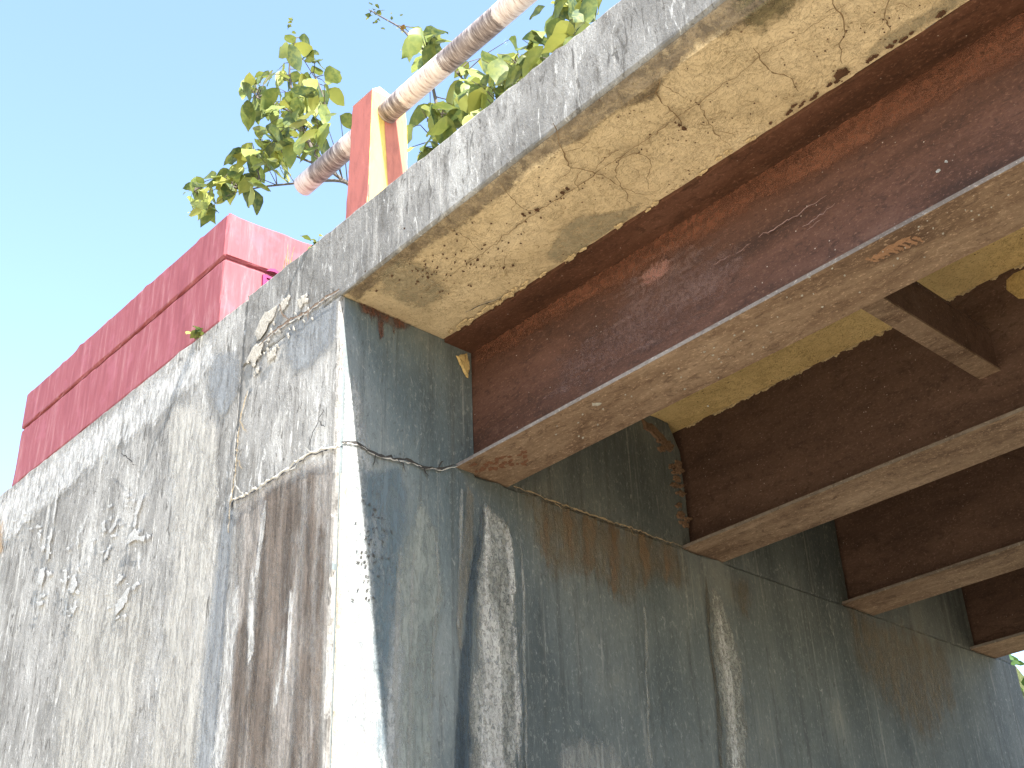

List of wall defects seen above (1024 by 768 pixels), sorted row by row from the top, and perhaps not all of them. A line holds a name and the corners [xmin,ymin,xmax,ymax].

peeling [0,342,212,620]
spalling [246,293,313,377]
water stain [152,353,443,768]
crack [259,289,339,347]
crack [227,390,457,531]
crack [514,486,680,547]
crack [424,0,914,312]
corrosion [477,11,1024,362]